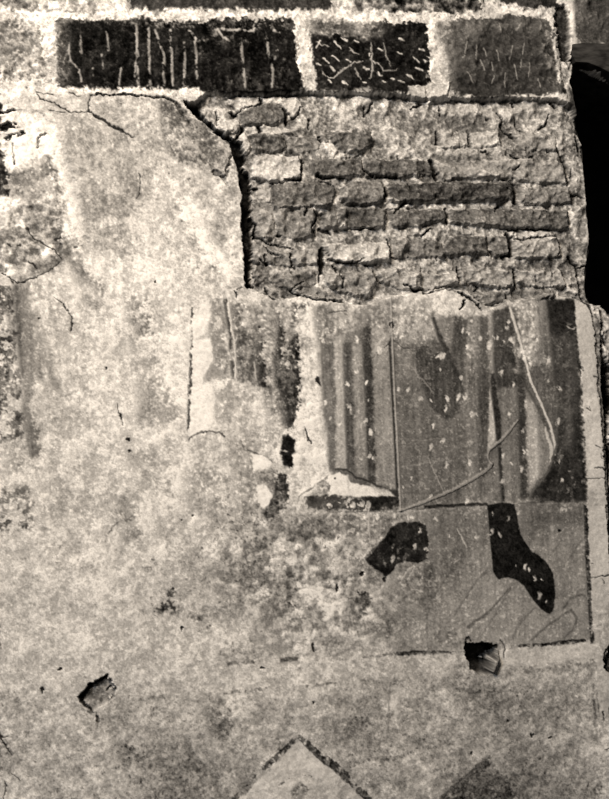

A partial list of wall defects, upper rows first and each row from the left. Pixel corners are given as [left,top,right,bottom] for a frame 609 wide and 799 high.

flaking render [0,108,78,243]
crack [0,226,78,285]
crack [35,91,519,512]
flaking render [154,61,609,521]
peeling [326,496,381,555]
peeling [406,513,430,552]